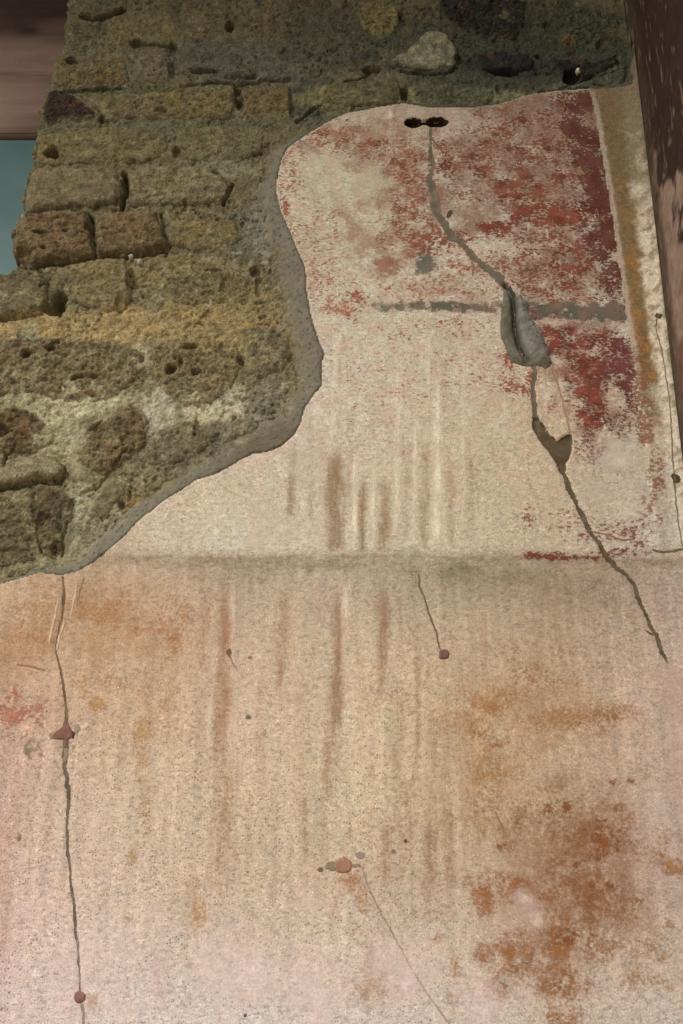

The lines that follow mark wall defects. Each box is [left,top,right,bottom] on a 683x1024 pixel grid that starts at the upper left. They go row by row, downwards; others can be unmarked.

flaking render [0,0,666,584]
crack [426,127,507,290]
damp [307,457,399,547]
damp [427,354,442,540]
crack [530,365,570,432]
crack [558,313,683,663]
damp [320,588,348,724]
crack [418,573,441,649]
crack [48,576,85,1024]
corrosion [472,804,641,1000]